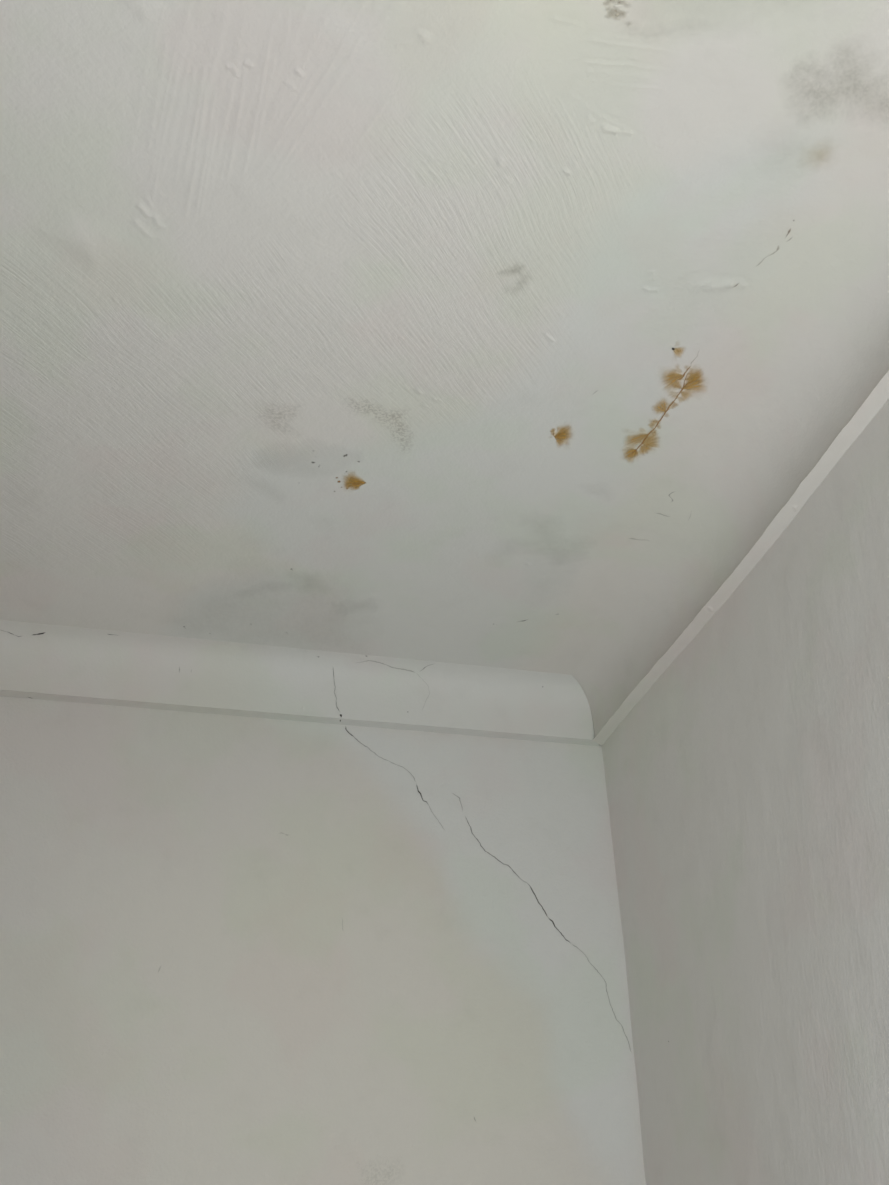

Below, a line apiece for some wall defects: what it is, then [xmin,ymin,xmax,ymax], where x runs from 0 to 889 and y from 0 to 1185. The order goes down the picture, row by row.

rust [627,367,700,458]
crack [467,821,569,942]